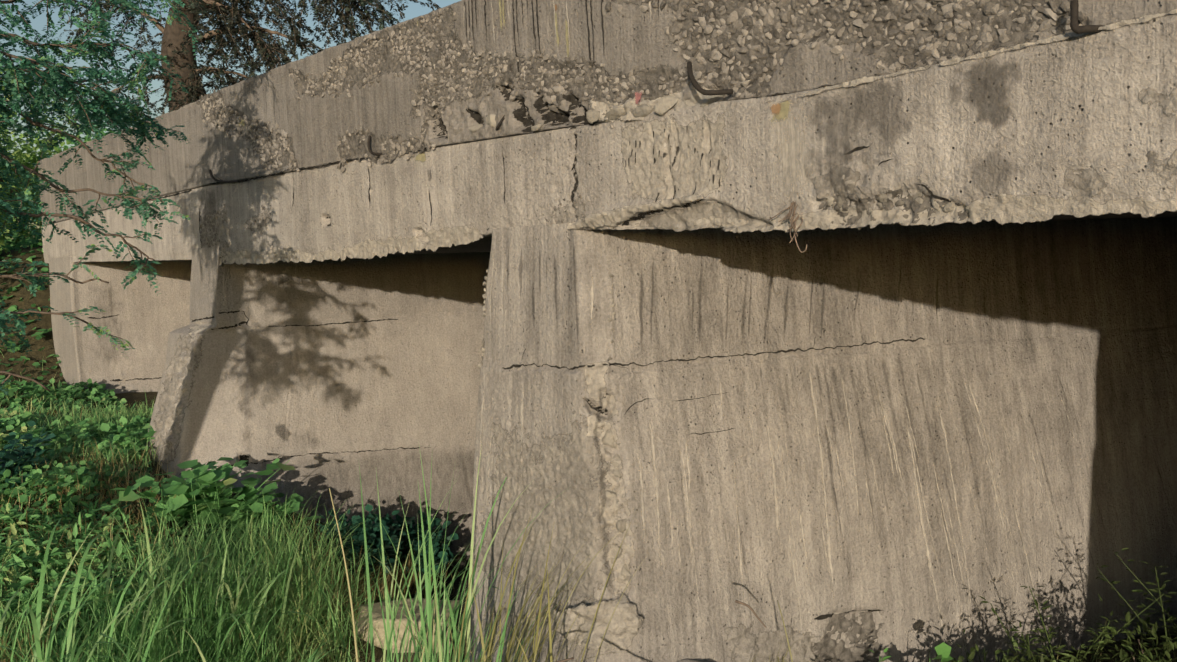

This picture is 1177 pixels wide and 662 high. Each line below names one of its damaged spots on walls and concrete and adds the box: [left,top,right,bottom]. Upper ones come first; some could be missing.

spalling [196,89,301,173]
crack [569,121,604,203]
spalling [288,0,1177,233]
crack [503,335,925,415]
peeling [474,394,644,652]
spalling [724,611,890,662]